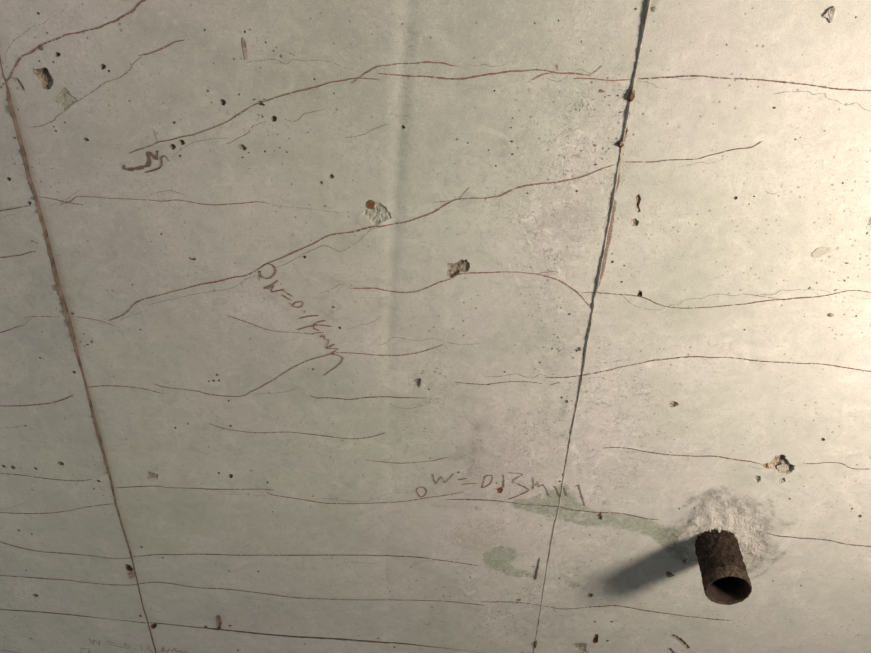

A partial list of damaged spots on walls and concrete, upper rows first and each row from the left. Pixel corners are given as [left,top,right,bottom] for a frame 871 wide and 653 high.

crack [0,0,146,89]
peeling [33,67,77,111]
crack [34,40,184,127]
crack [130,59,871,154]
crack [0,190,283,217]
crack [79,140,764,328]
spalling [447,260,470,278]
crack [322,271,871,329]
crack [92,337,472,409]
crack [456,356,871,385]
crack [608,447,761,469]
spalling [754,455,795,483]